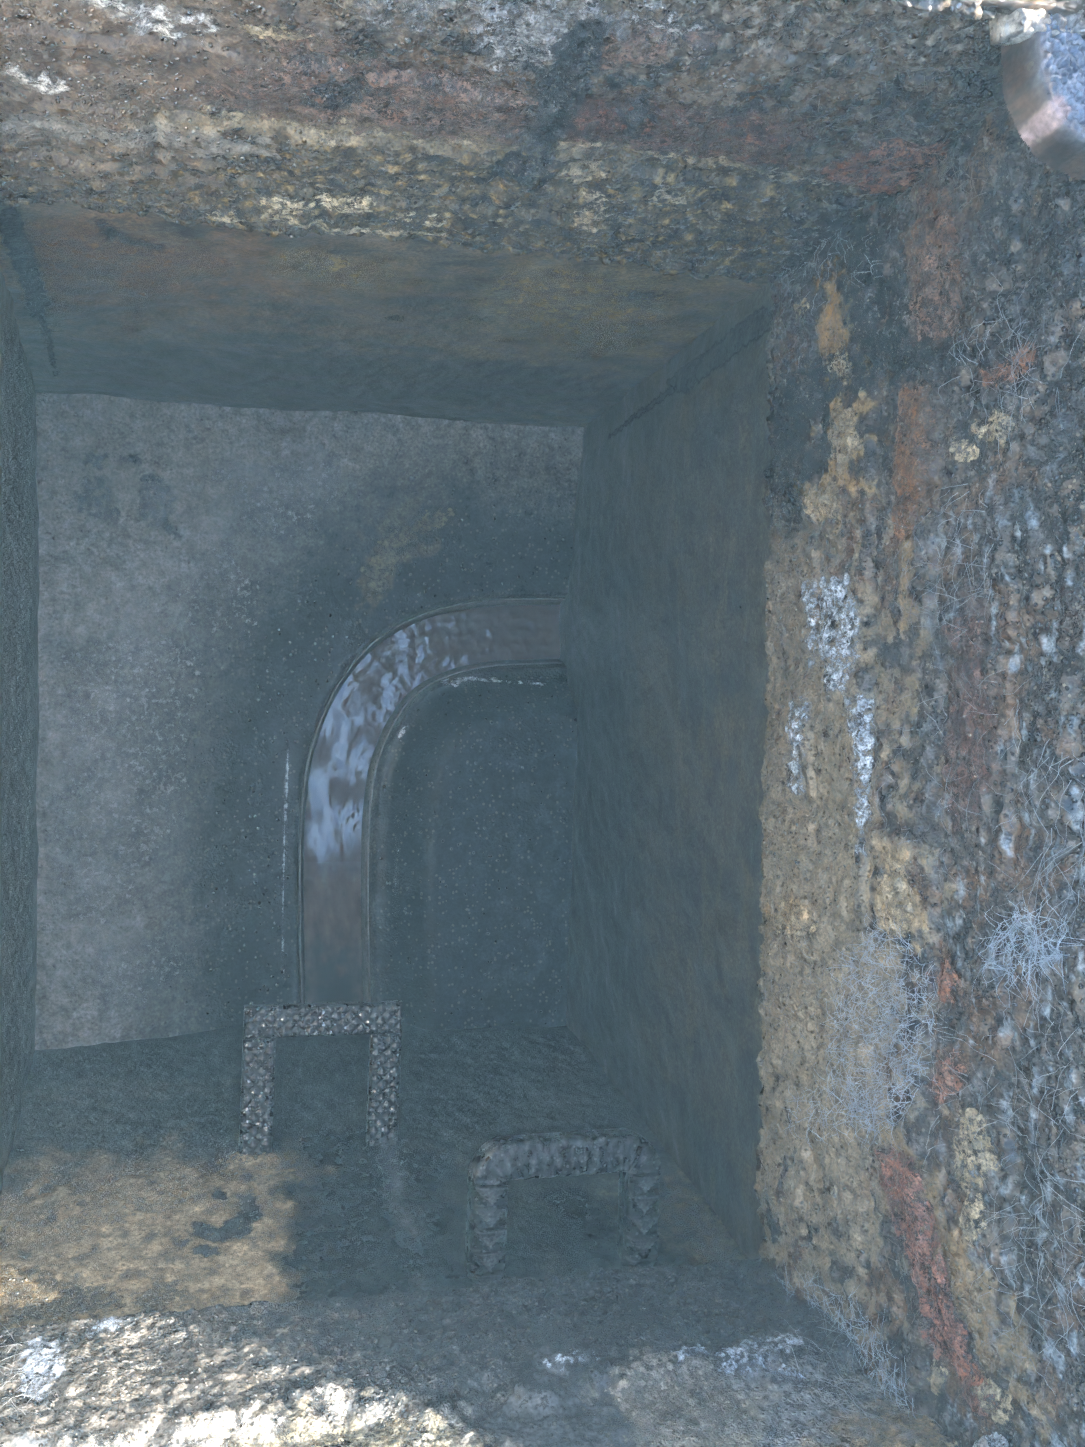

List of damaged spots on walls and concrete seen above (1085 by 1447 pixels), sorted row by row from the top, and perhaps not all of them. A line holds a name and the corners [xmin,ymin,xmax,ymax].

water stain [785,700,809,795]
water stain [801,569,875,857]
water stain [0,1127,471,1401]
water stain [539,1183,749,1277]